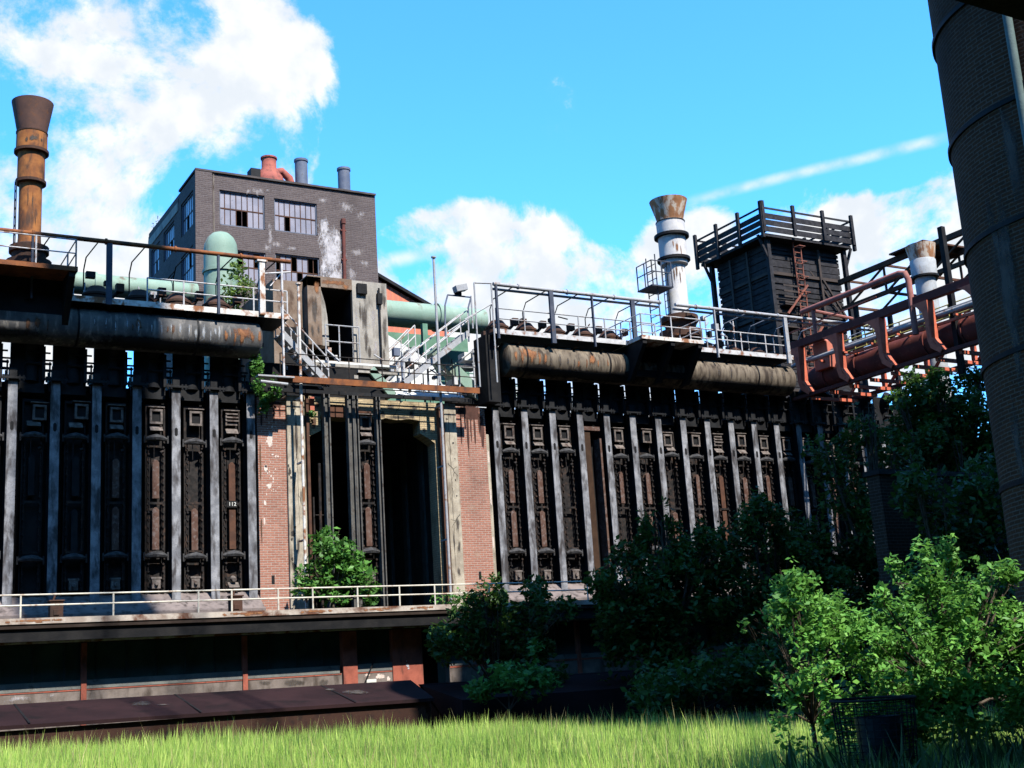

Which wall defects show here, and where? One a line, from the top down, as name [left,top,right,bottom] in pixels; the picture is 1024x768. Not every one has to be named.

rust [225,328,262,344]
rust [514,348,547,364]
spalling [264,418,292,505]